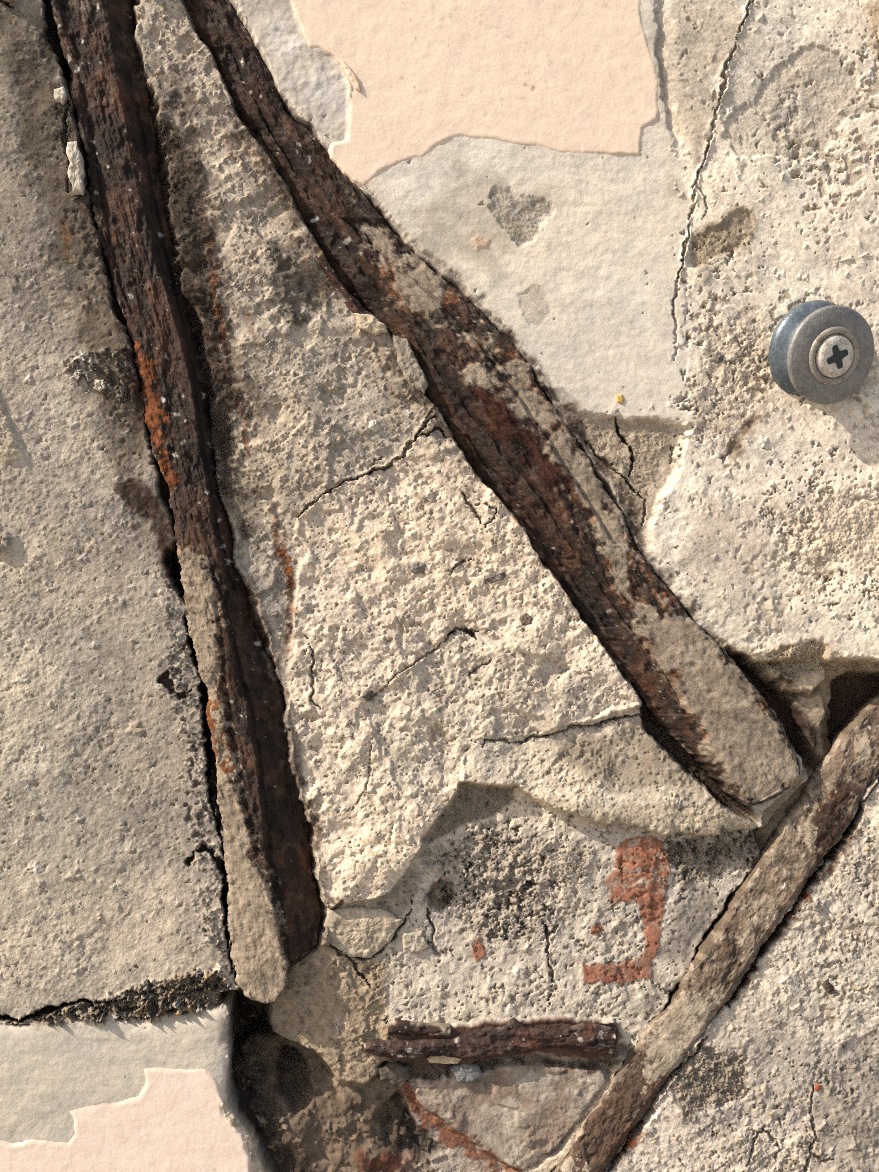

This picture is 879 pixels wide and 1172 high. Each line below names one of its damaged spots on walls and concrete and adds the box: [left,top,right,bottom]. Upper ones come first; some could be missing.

crack [681,0,754,261]
corrosion [498,329,555,403]
crack [313,416,444,503]
crack [585,417,645,523]
corrosion [116,480,178,575]
crack [375,629,490,694]
corrosion [639,695,750,815]
corrosion [727,653,879,770]
crack [0,998,100,1025]
corrosion [363,1017,616,1083]
spalling [244,1031,398,1172]
spalling [398,1085,522,1172]